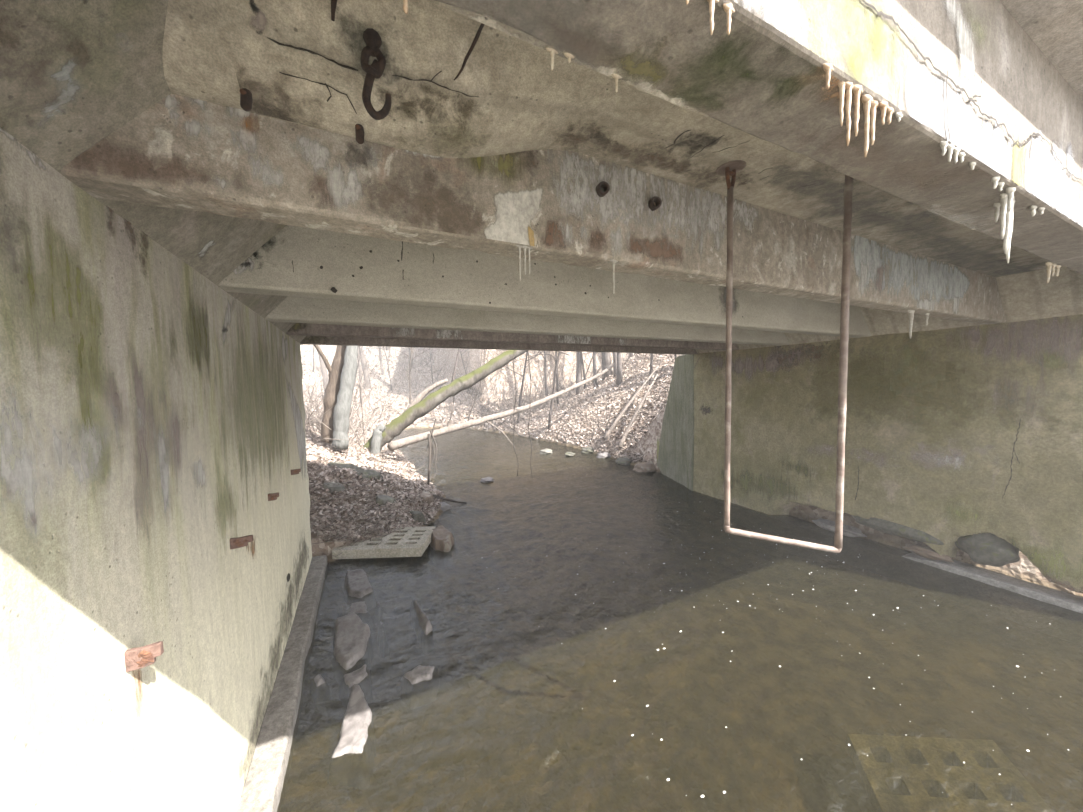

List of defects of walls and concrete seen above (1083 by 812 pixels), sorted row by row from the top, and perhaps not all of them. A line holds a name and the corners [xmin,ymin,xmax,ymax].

leakage [469,16,519,38]
crack [267,37,358,114]
crack [392,71,479,97]
leakage [559,55,616,76]
leakage [626,81,706,117]
crack [862,0,1083,181]
leakage [839,123,871,149]
leakage [774,166,1040,277]
leakage [132,360,180,518]
leakage [287,381,306,475]
corrosion [233,539,255,556]
corrosion [133,650,154,701]